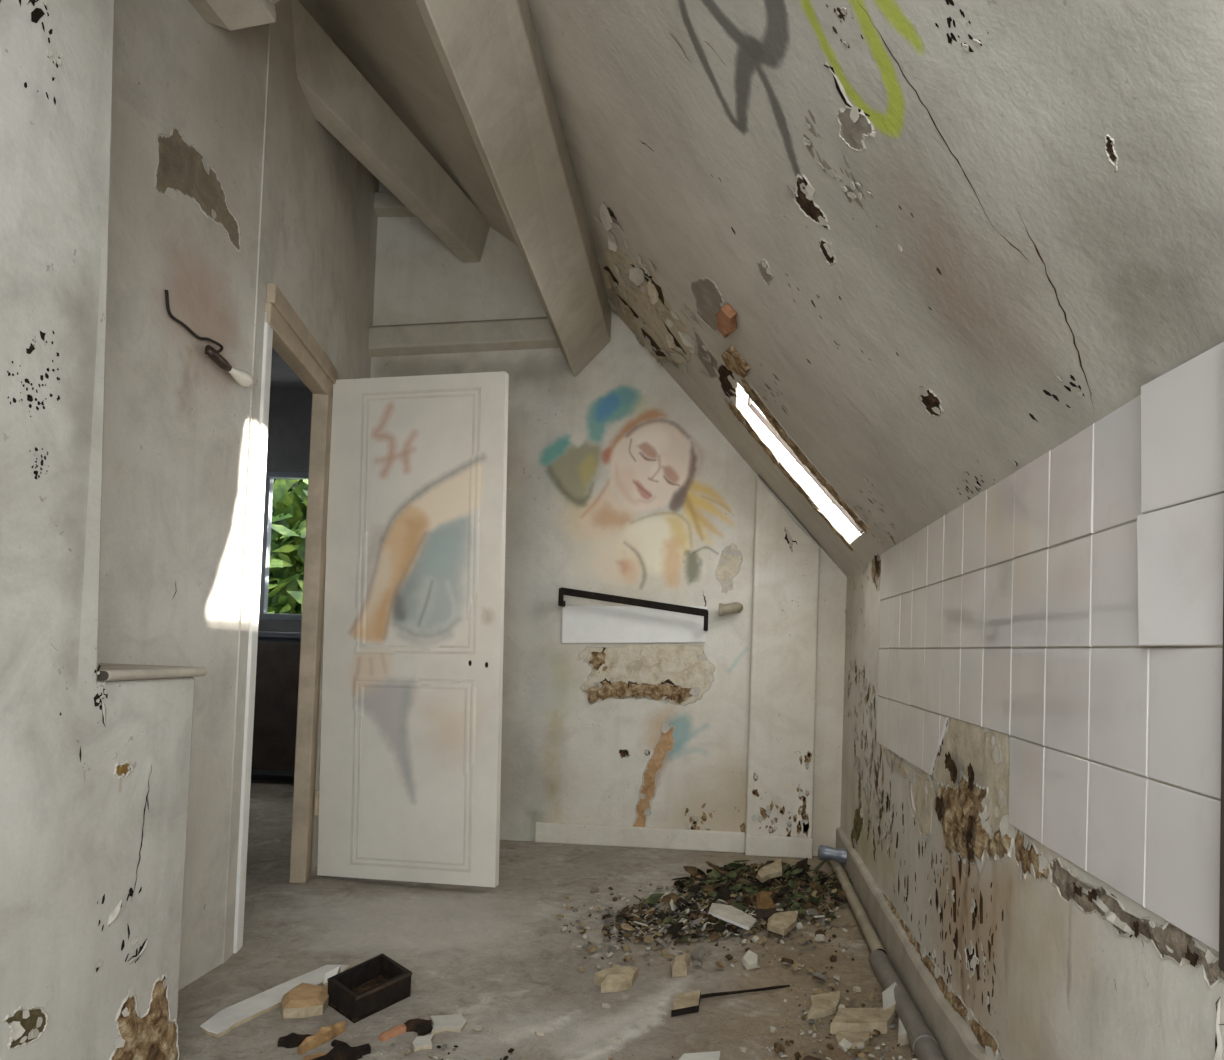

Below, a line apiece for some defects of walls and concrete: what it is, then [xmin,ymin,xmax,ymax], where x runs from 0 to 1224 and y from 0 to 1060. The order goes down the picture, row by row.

crack [824,62,870,117]
flaking render [154,127,241,252]
flaking render [787,174,837,266]
crack [855,0,1095,410]
flaking render [592,202,896,639]
flaking render [919,386,944,417]
flaking render [577,643,716,706]
flaking render [618,724,675,827]
peeling [735,772,810,837]
flaking render [846,656,1224,1060]
flaking render [2,1005,48,1050]
flaking render [109,973,180,1060]